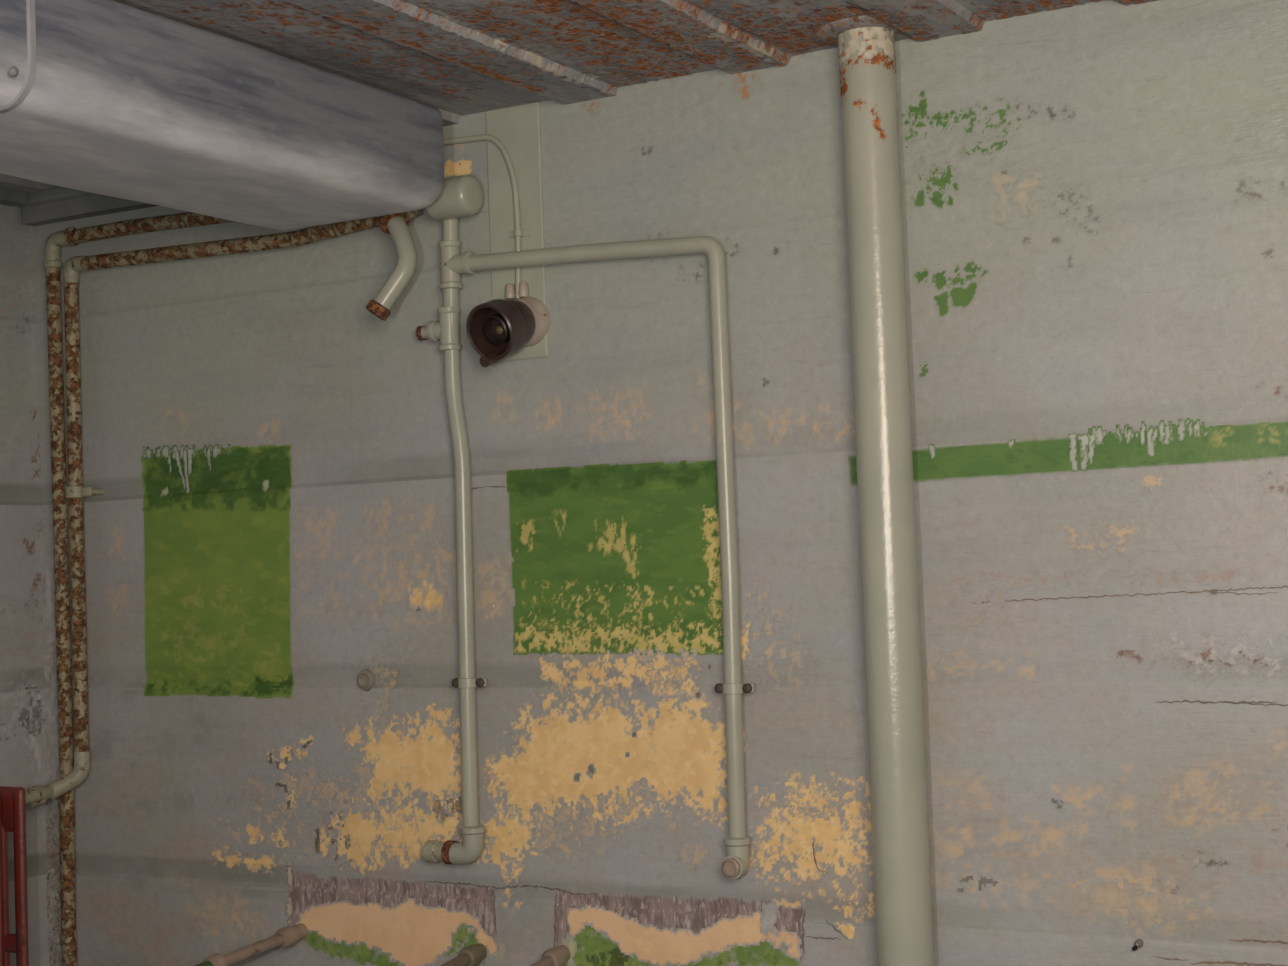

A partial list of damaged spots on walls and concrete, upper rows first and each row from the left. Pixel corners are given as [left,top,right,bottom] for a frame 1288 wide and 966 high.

corrosion [205,0,940,141]
peeling [898,89,1077,210]
peeling [914,260,990,317]
peeling [919,360,929,379]
peeling [739,568,817,700]
crack [973,585,1288,604]
peeling [0,548,77,966]
peeling [197,630,463,882]
peeling [474,647,728,912]
peeling [745,764,876,940]
crack [1155,939,1288,966]